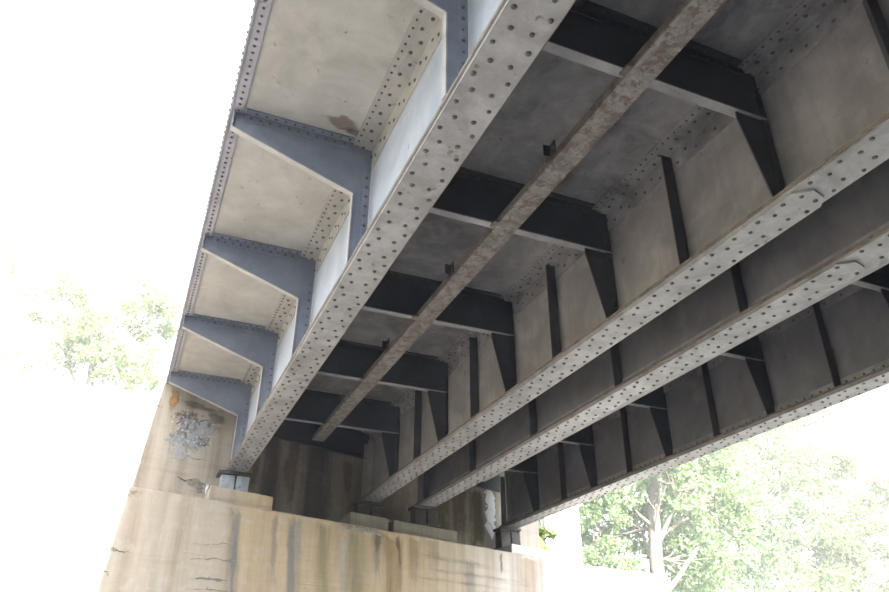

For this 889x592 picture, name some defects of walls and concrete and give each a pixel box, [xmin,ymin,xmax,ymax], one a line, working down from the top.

peeling [166,410,220,494]
leakage [471,492,483,546]